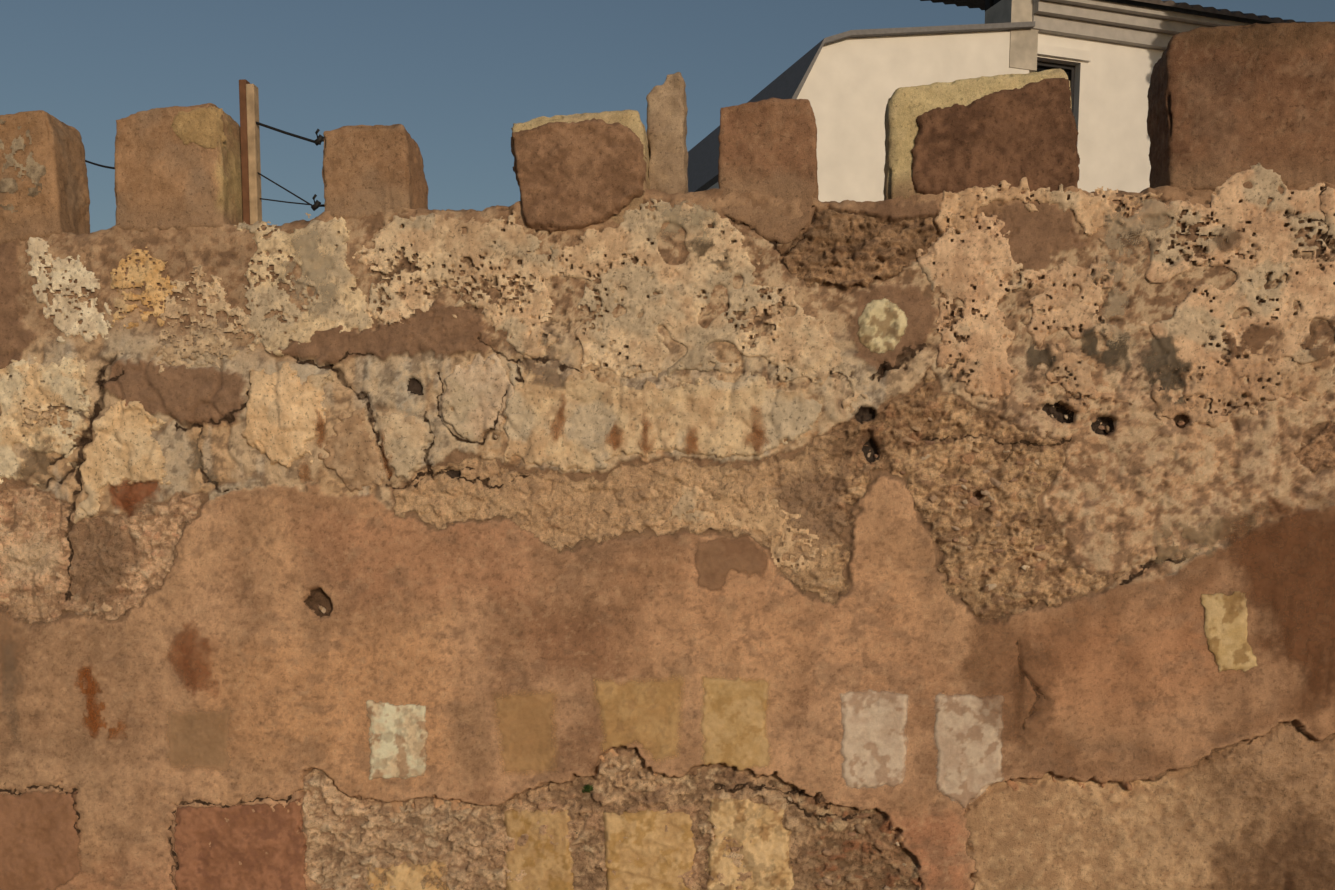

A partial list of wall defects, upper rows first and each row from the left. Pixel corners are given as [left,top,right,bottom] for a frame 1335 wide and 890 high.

crack [37,353,124,601]
crack [292,337,599,489]
spalling [0,162,1335,624]
damp [1227,501,1335,696]
corrosion [78,668,121,737]
spalling [295,748,922,890]
spalling [964,723,1335,890]